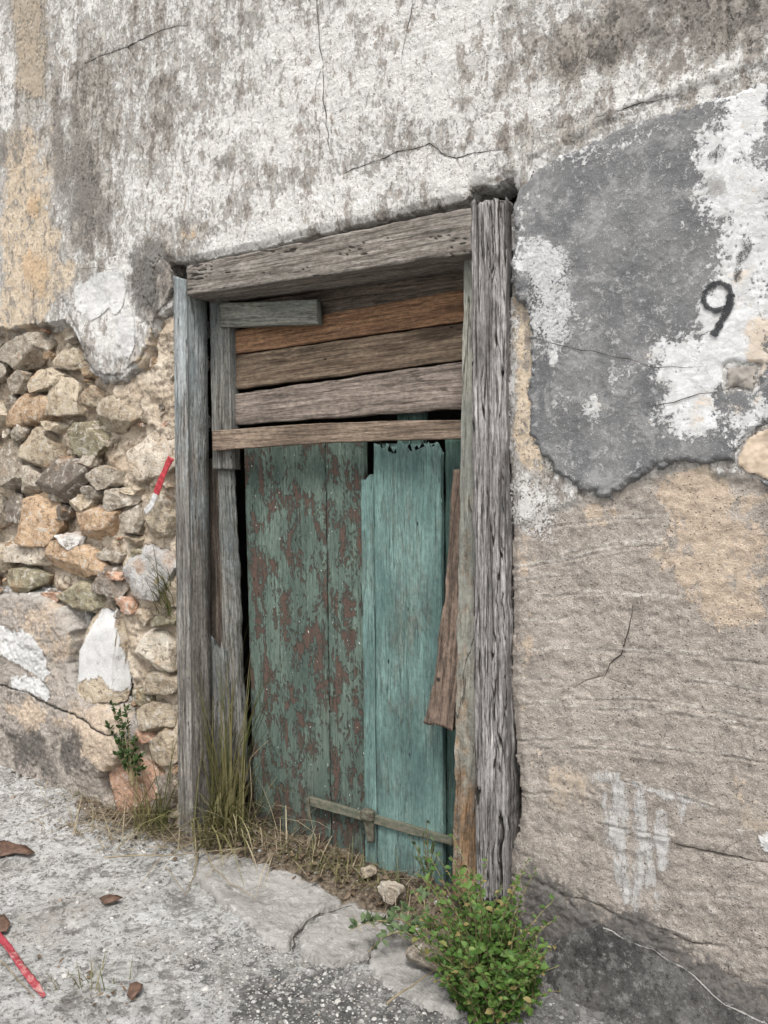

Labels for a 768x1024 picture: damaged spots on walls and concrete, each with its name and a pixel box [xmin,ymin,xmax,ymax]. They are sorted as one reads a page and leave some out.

crack [87,26,176,67]
crack [315,0,495,174]
peeling [523,237,573,354]
spalling [738,429,768,480]
spalling [0,251,179,827]
crack [575,605,638,687]
crack [0,684,113,736]
crack [513,875,767,1024]